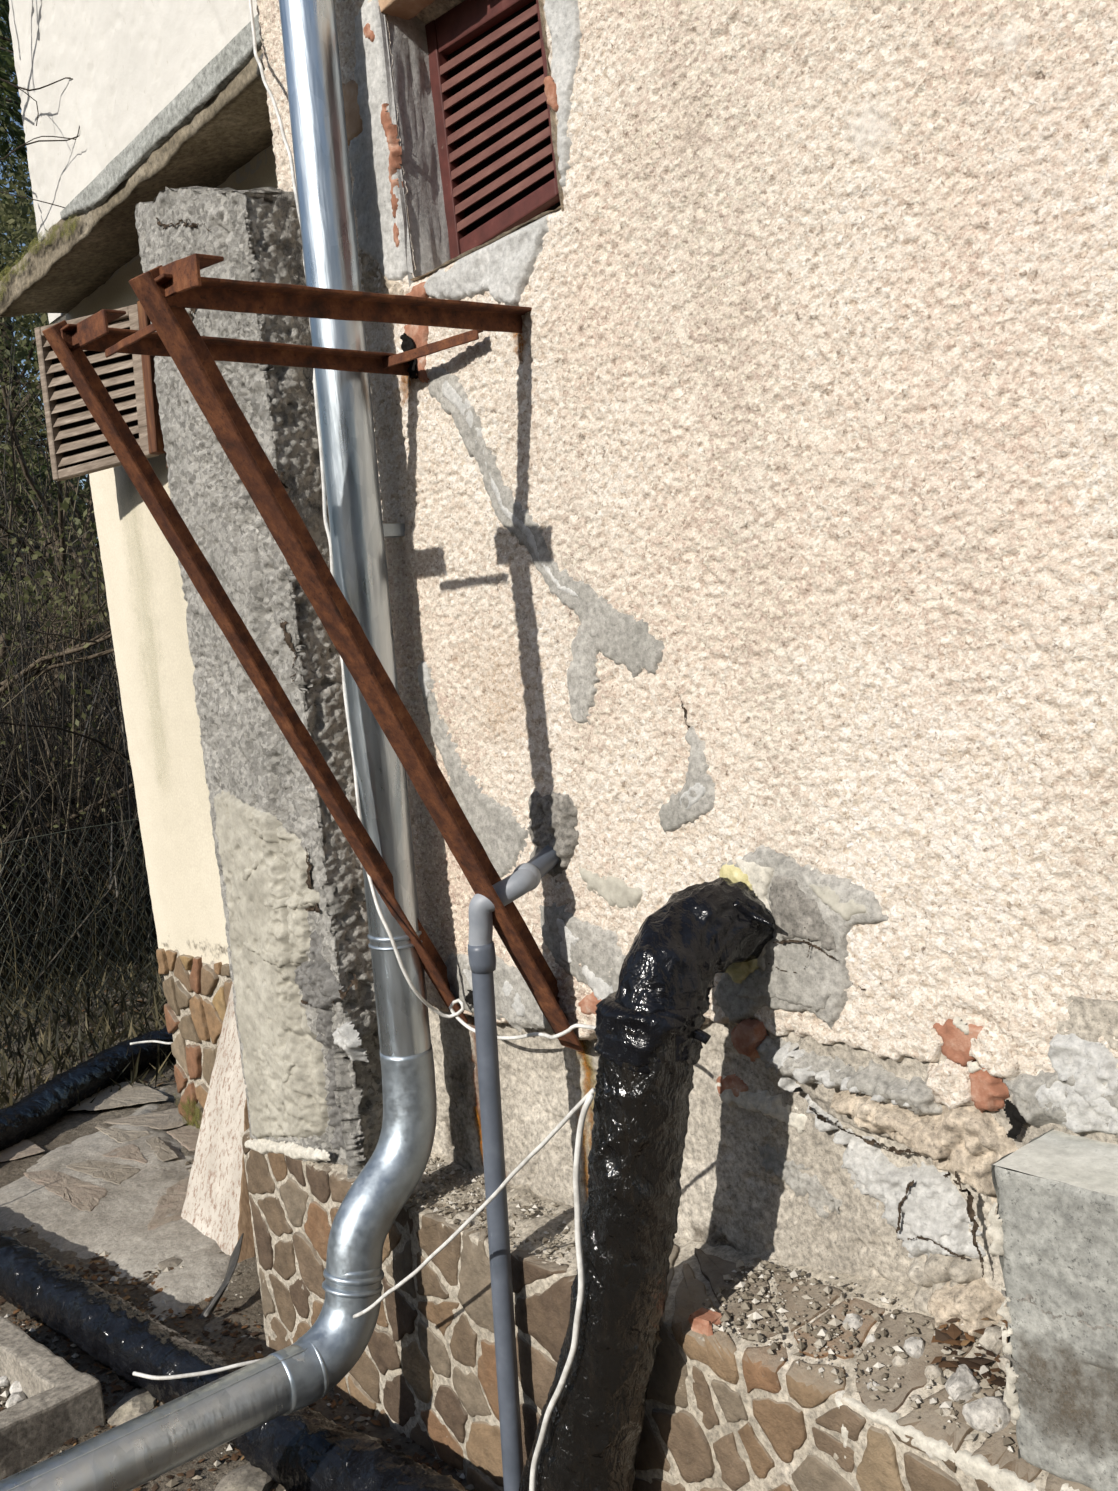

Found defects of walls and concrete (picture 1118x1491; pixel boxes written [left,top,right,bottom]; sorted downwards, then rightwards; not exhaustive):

spalling [363,23,375,42]
flaking render [342,80,363,145]
flaking render [543,76,559,112]
spalling [380,103,403,248]
spalling [358,250,429,298]
flaking render [404,325,429,383]
flaking render [731,1017,768,1062]
rust [474,1103,483,1160]
rust [579,1040,594,1186]
flaking render [716,1074,748,1097]
spalling [829,979,1057,1207]
crack [809,1106,984,1277]